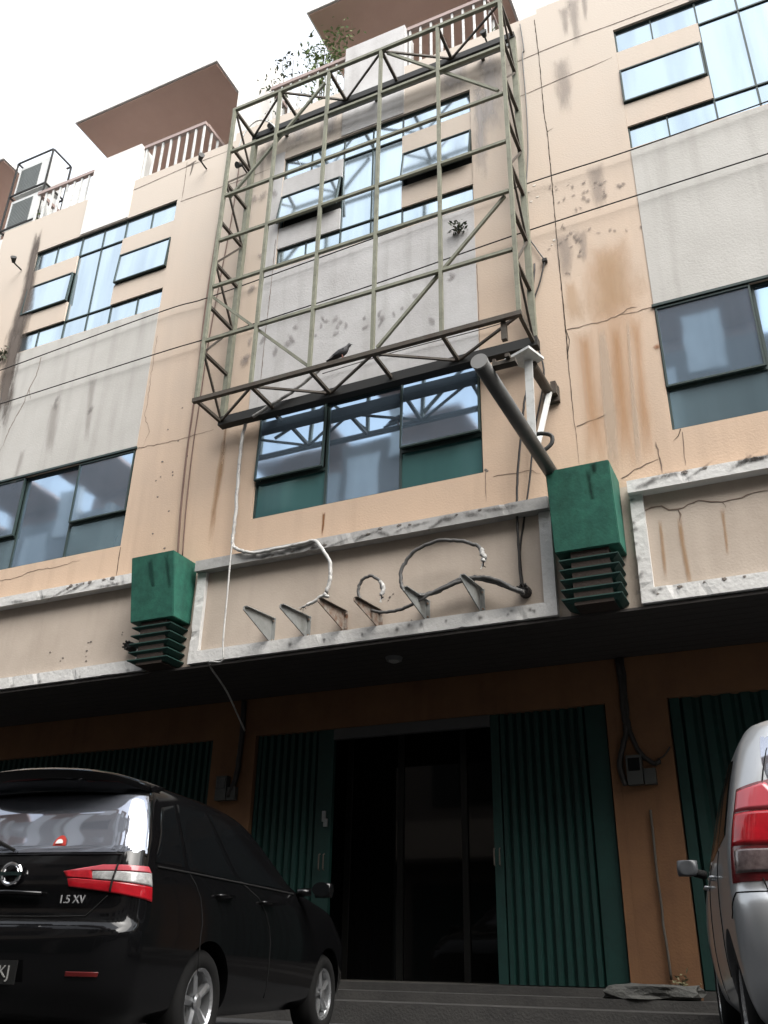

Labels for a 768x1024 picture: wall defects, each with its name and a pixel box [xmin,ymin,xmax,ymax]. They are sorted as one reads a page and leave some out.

crack [534,20,650,459]
crack [622,429,686,478]
crack [645,490,767,521]